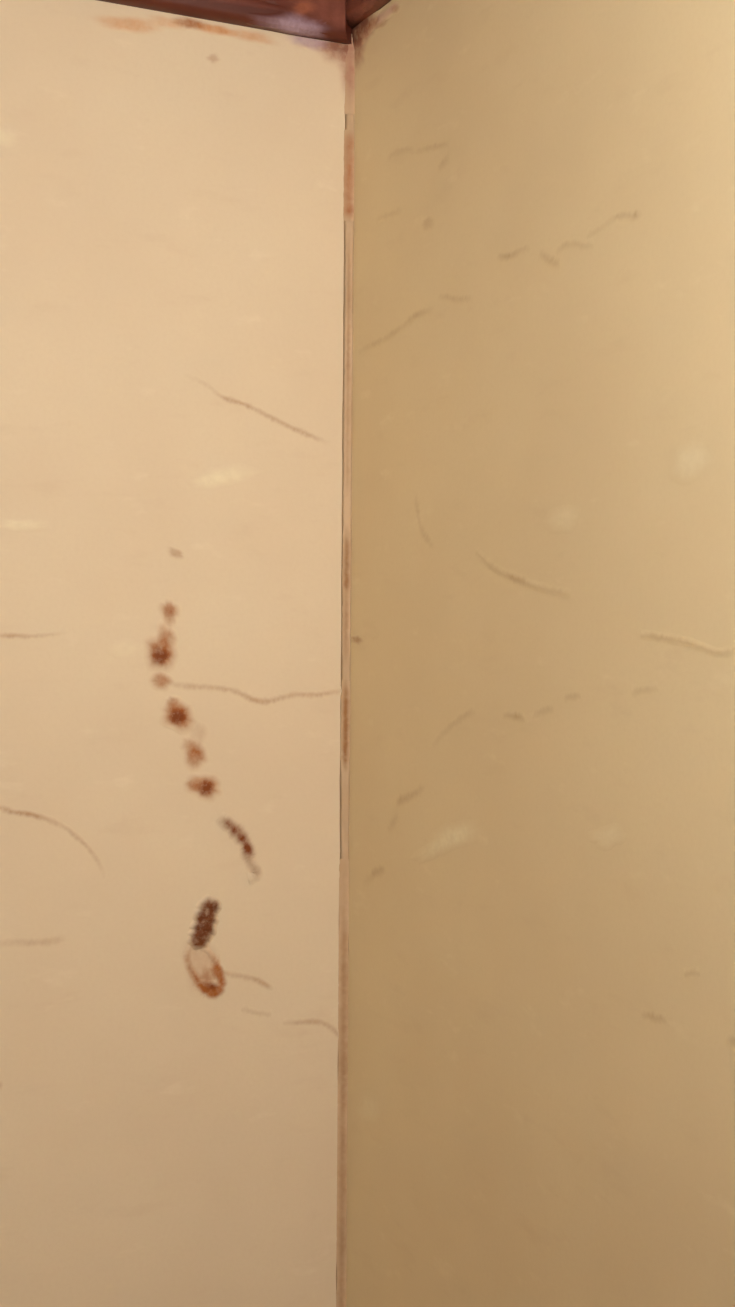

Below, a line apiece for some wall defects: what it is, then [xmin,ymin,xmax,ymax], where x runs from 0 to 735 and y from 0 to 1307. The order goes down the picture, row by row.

crack [0,628,68,640]
crack [0,803,109,879]
corrosion [142,597,264,886]
corrosion [179,895,275,1000]
crack [170,232,352,772]
crack [241,859,349,1307]